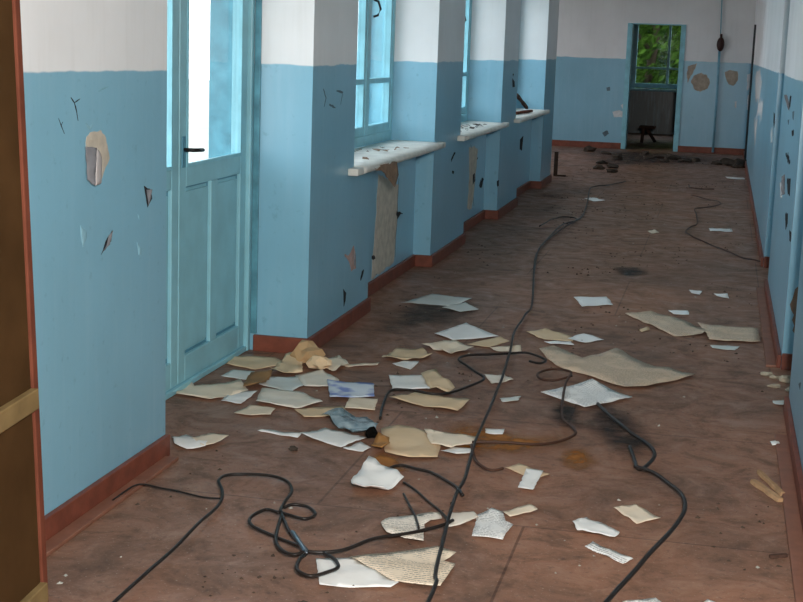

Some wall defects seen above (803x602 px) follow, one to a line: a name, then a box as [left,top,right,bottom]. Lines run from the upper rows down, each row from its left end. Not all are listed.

flaking render [687,63,710,92]
peeling [85,130,110,186]
peeling [144,186,153,207]
peeling [345,161,403,280]
flaking render [790,287,798,332]